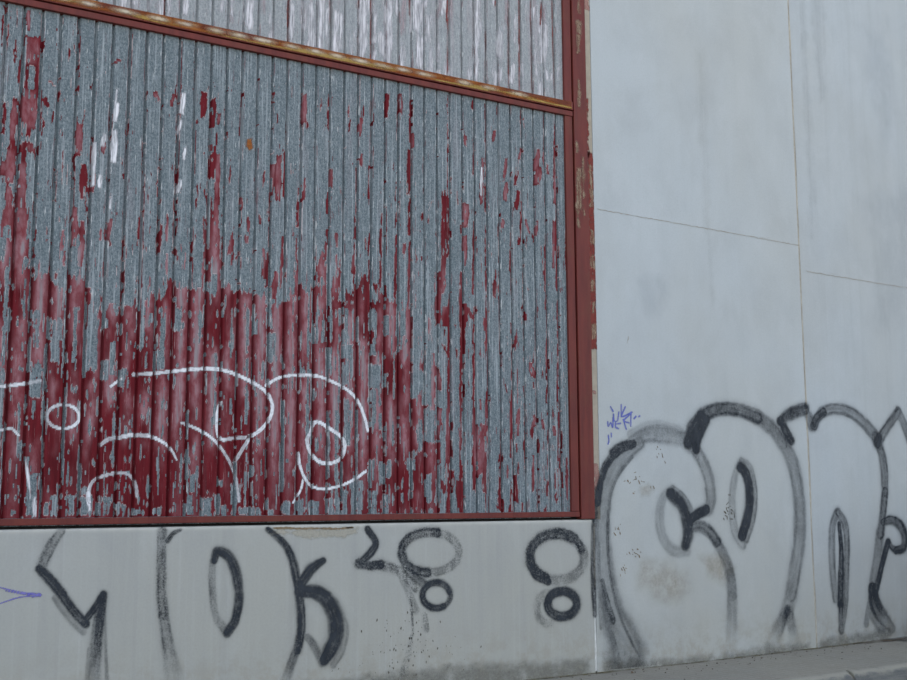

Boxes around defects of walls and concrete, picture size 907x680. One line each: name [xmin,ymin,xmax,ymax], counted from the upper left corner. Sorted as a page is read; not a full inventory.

peeling [0,0,569,519]
peeling [576,83,597,349]
spalling [273,526,356,538]